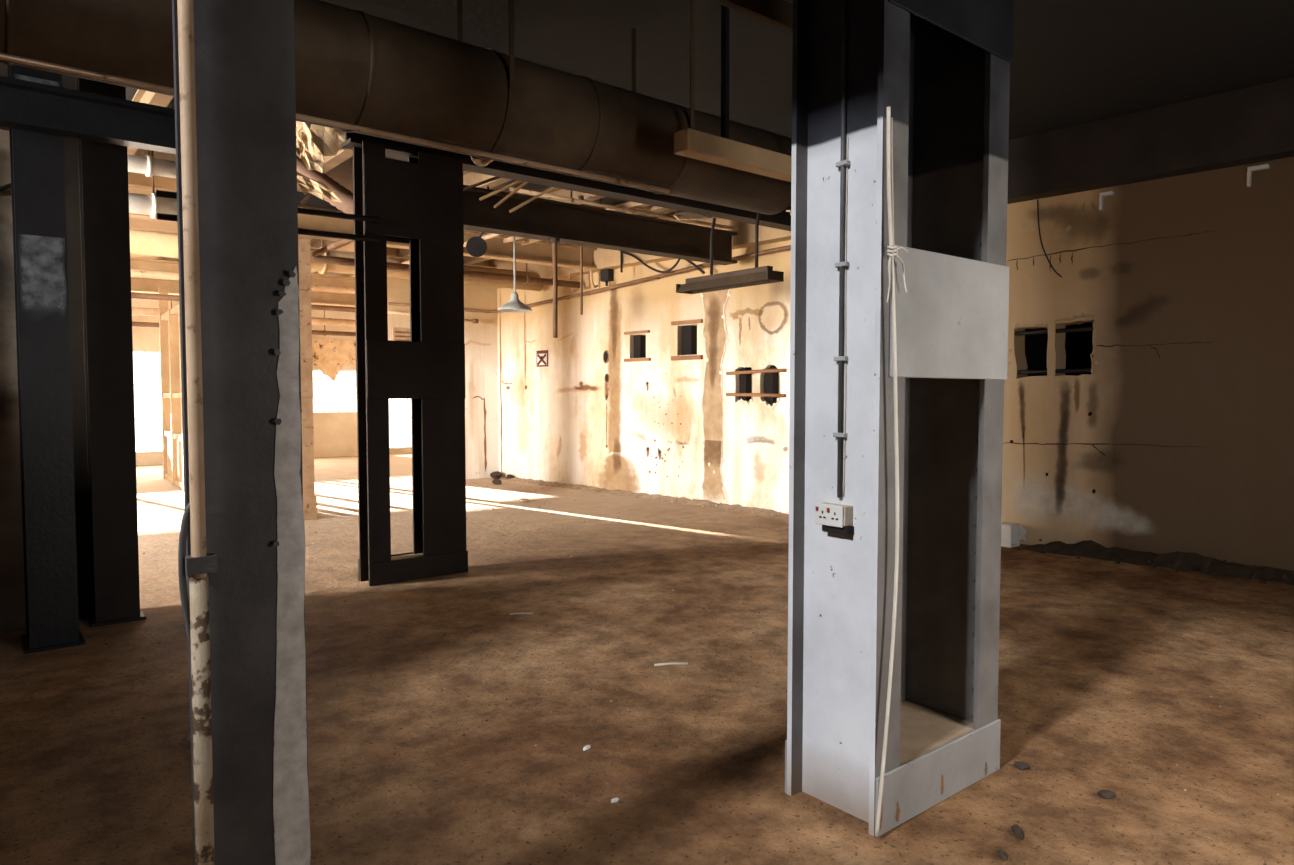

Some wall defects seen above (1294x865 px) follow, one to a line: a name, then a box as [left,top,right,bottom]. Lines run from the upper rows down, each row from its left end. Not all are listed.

damp [556,269,702,493]
damp [1001,383,1170,541]